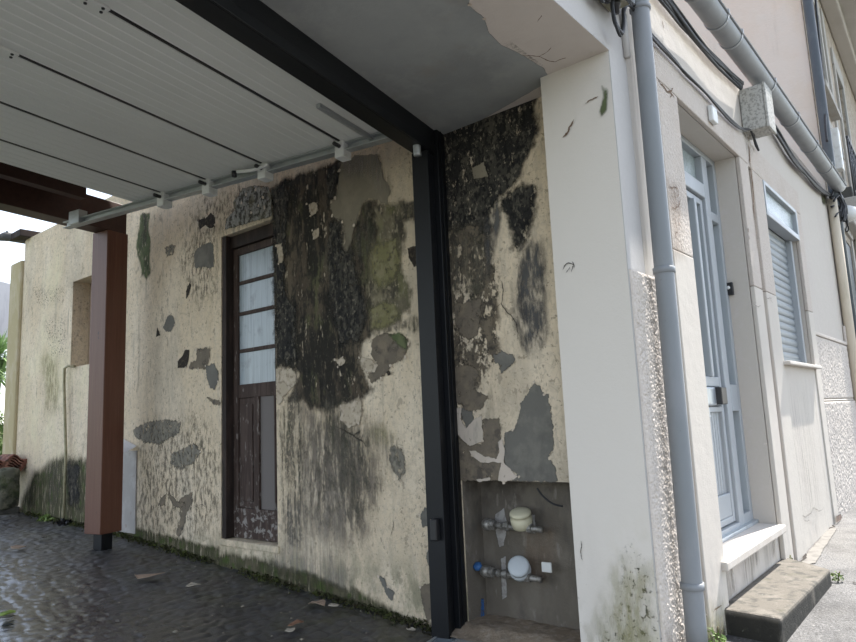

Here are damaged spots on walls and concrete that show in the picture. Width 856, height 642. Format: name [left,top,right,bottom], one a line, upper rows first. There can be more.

peeling [260,0,547,134]
damp [444,99,546,351]
flaking render [176,347,221,405]
damp [271,160,377,546]
spalling [368,332,410,384]
flaking render [448,225,558,484]
damp [50,461,80,506]
flaking render [123,419,181,453]
flaking render [170,444,201,470]
damp [389,445,406,480]
damp [274,567,346,599]
damp [606,568,656,642]